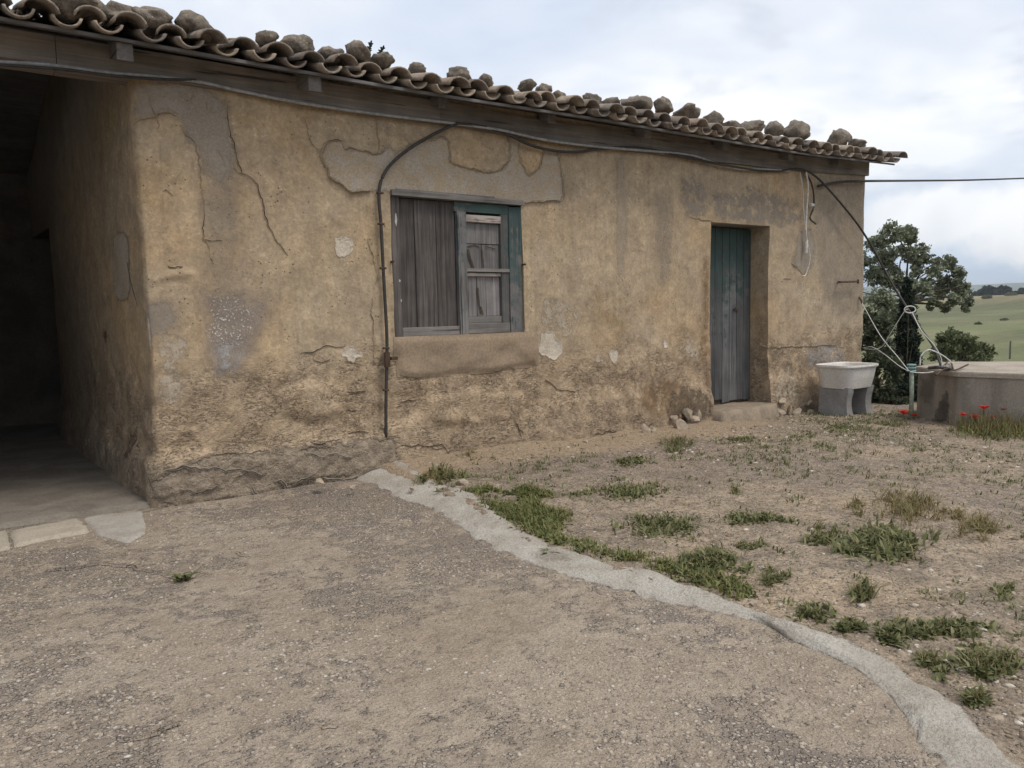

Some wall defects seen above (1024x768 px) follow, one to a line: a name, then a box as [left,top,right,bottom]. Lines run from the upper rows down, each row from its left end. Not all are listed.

crack [146,91,288,263]
flaking render [320,136,565,208]
peeling [335,236,353,257]
crack [300,345,345,363]
peeling [341,346,363,363]
peeling [539,331,563,360]
crack [311,390,369,445]
crack [207,449,276,457]